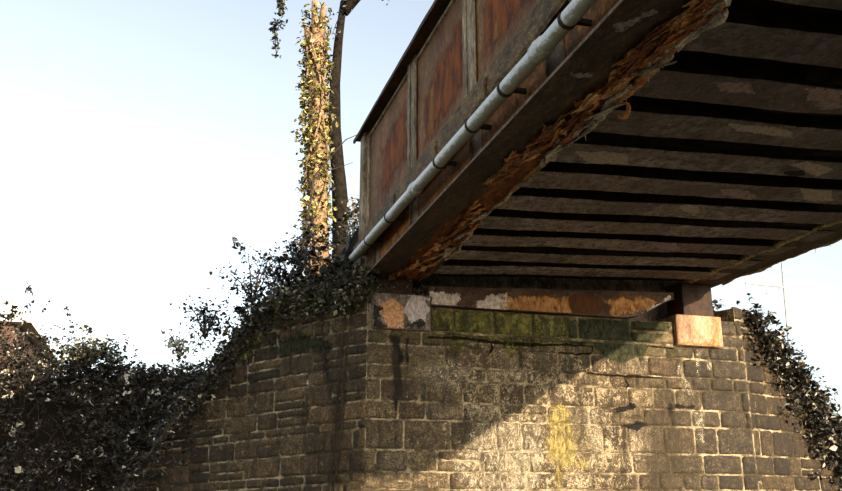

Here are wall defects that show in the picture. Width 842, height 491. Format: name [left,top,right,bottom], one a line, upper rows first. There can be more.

spalling [484,0,732,186]
peeling [728,123,794,139]
peeling [784,161,835,178]
peeling [799,188,834,202]
peeling [376,291,461,329]
peeling [476,292,510,310]
leakage [389,335,409,412]
leakage [455,404,594,491]